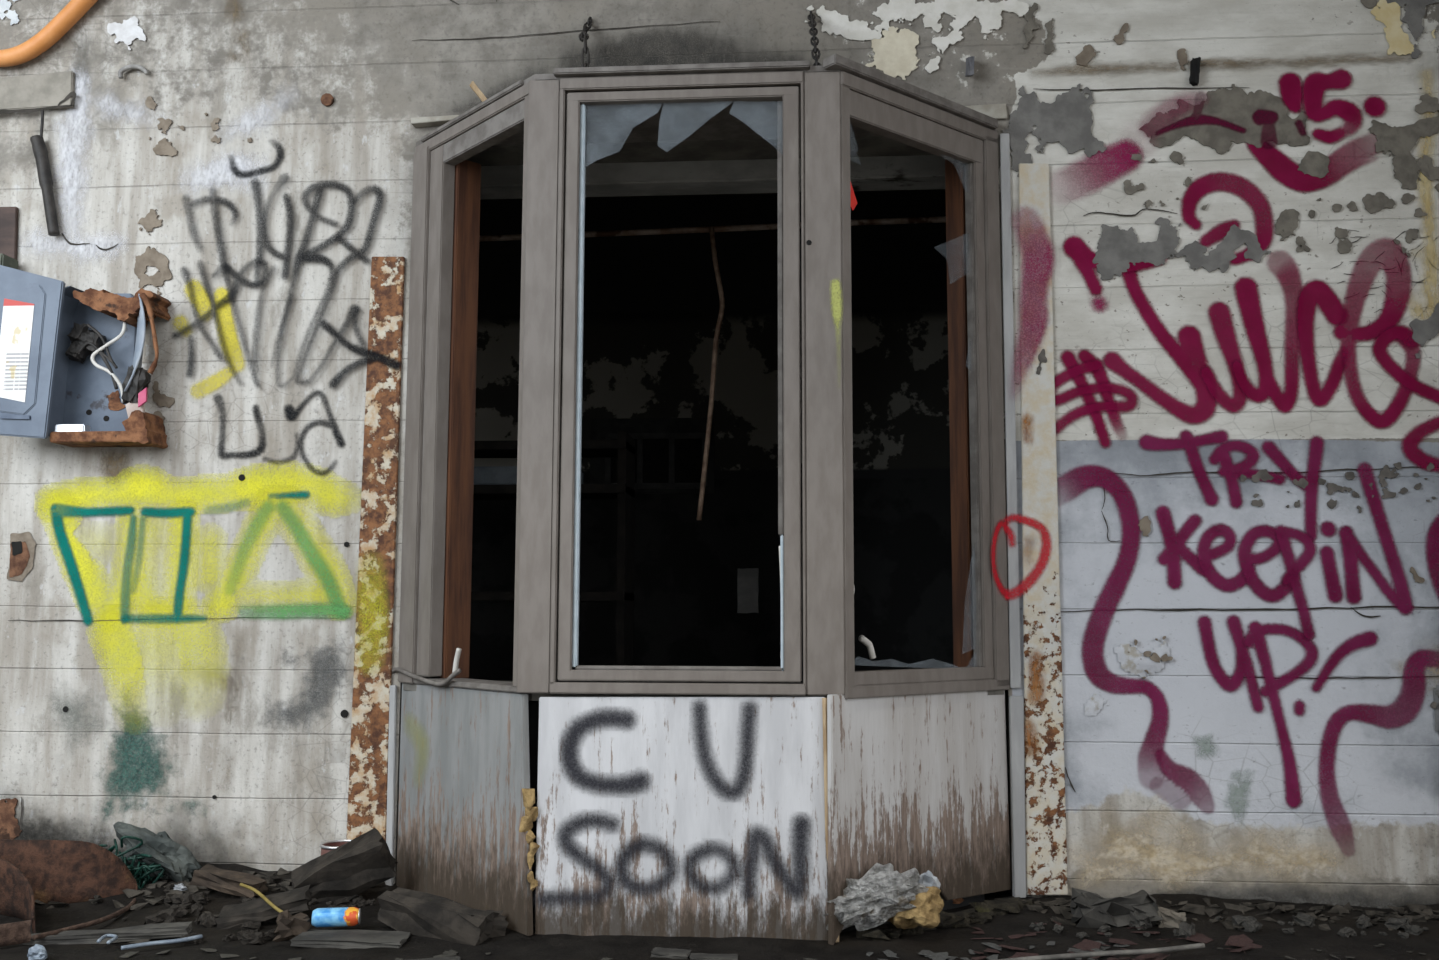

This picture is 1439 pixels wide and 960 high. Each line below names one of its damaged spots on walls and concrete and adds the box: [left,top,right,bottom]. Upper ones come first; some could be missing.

peeling [0,0,20,26]
peeling [107,16,147,50]
peeling [805,0,1055,80]
peeling [1075,45,1096,66]
peeling [1360,0,1439,59]
peeling [1002,83,1107,177]
peeling [1092,84,1439,280]
peeling [1409,303,1439,359]
rust [1031,653,1043,702]
water stain [104,712,171,814]
rust [1025,723,1036,754]
water stain [13,819,122,860]